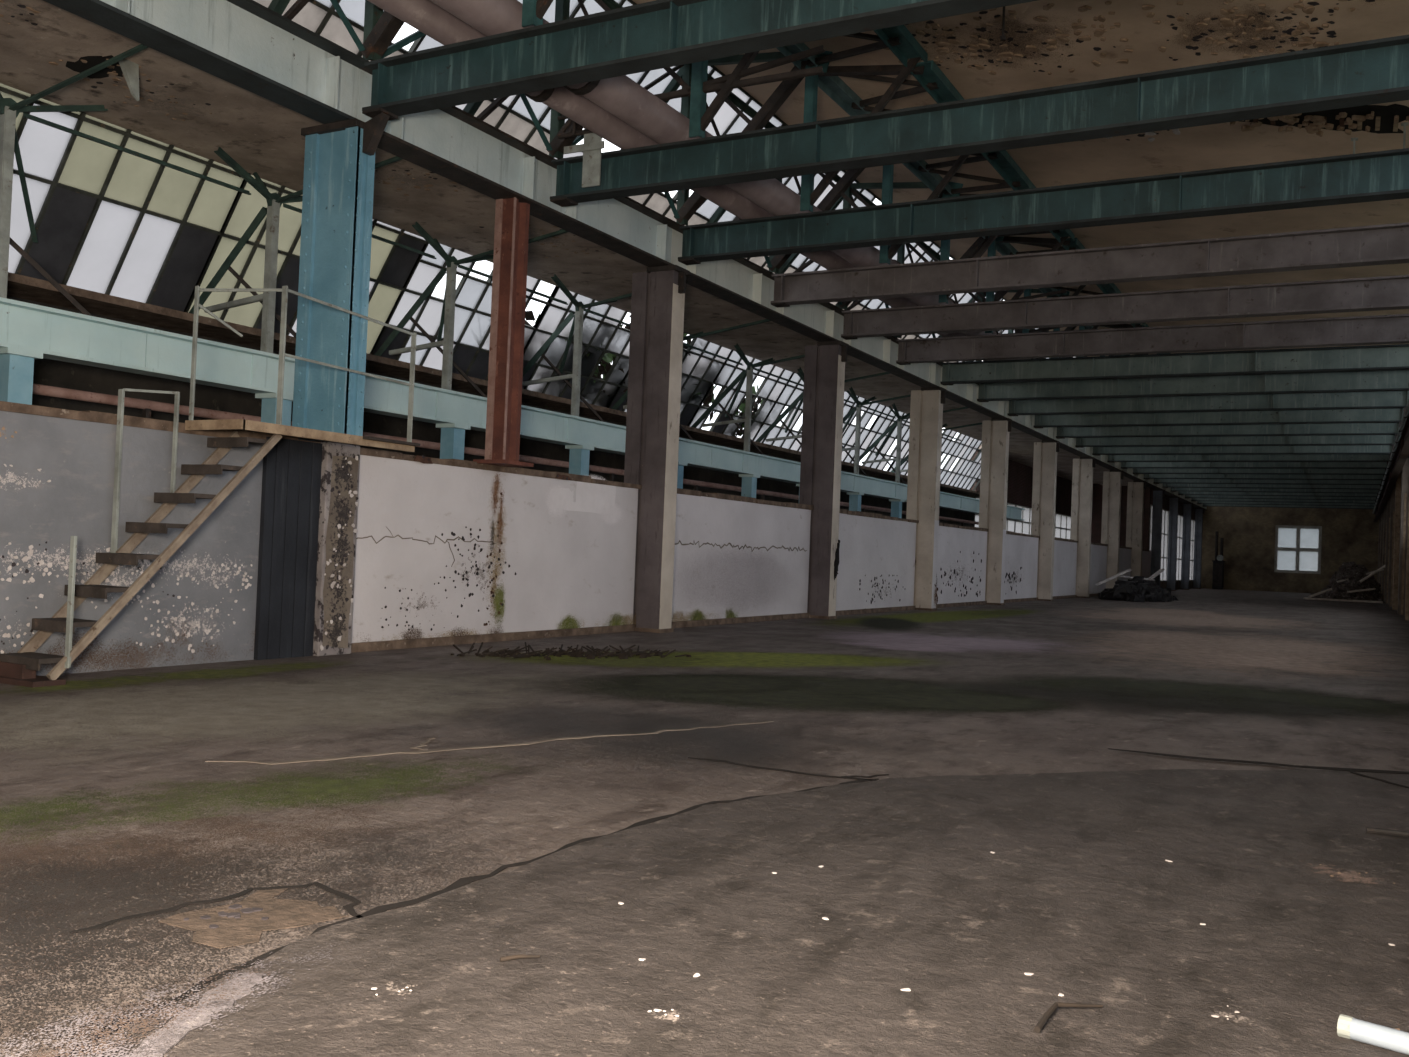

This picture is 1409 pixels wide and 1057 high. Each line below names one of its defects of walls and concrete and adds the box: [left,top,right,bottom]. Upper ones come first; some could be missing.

peeling [1259,111,1374,137]
water stain [36,614,256,674]
flaking render [320,452,359,651]
crack [55,721,889,1057]